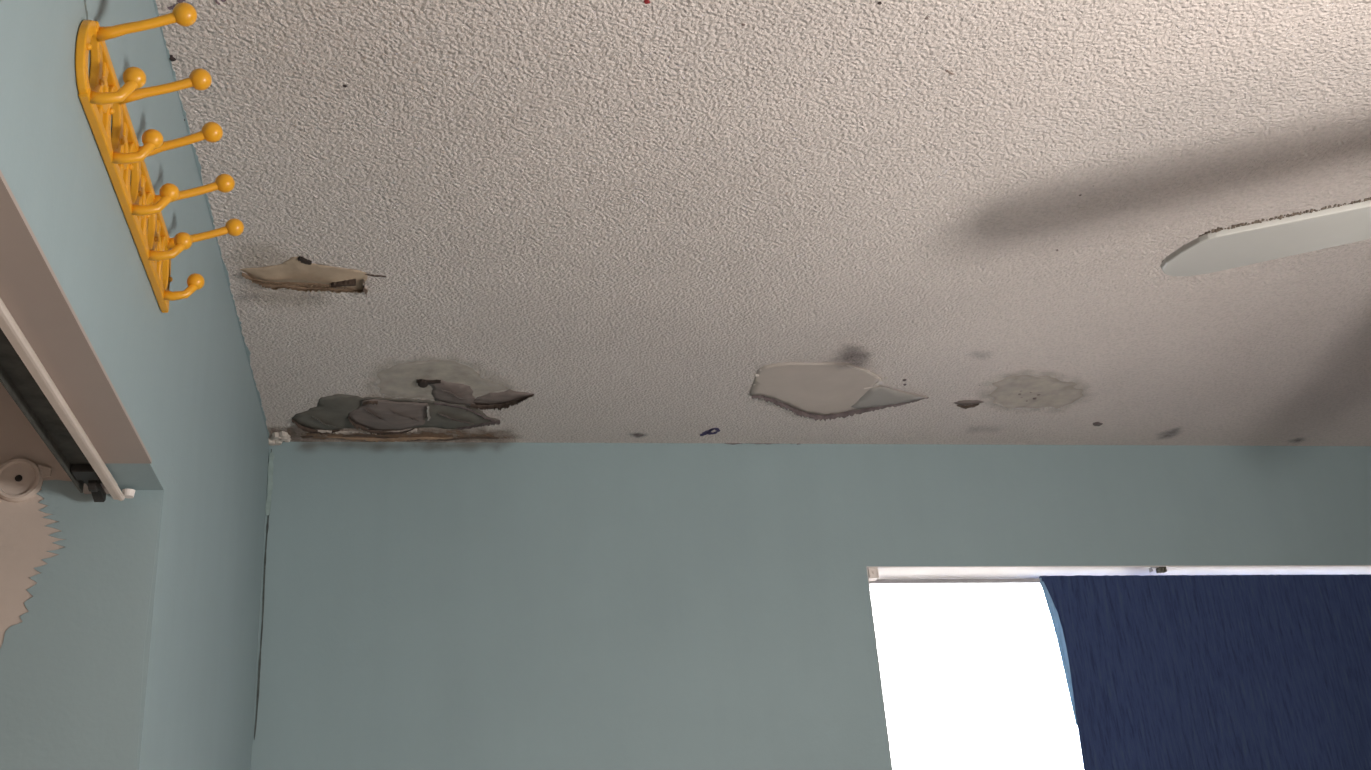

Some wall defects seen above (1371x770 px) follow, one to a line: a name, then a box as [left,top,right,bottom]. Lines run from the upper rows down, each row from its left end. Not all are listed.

peeling [379,361,506,421]
peeling [750,362,929,421]
water stain [300,429,511,440]